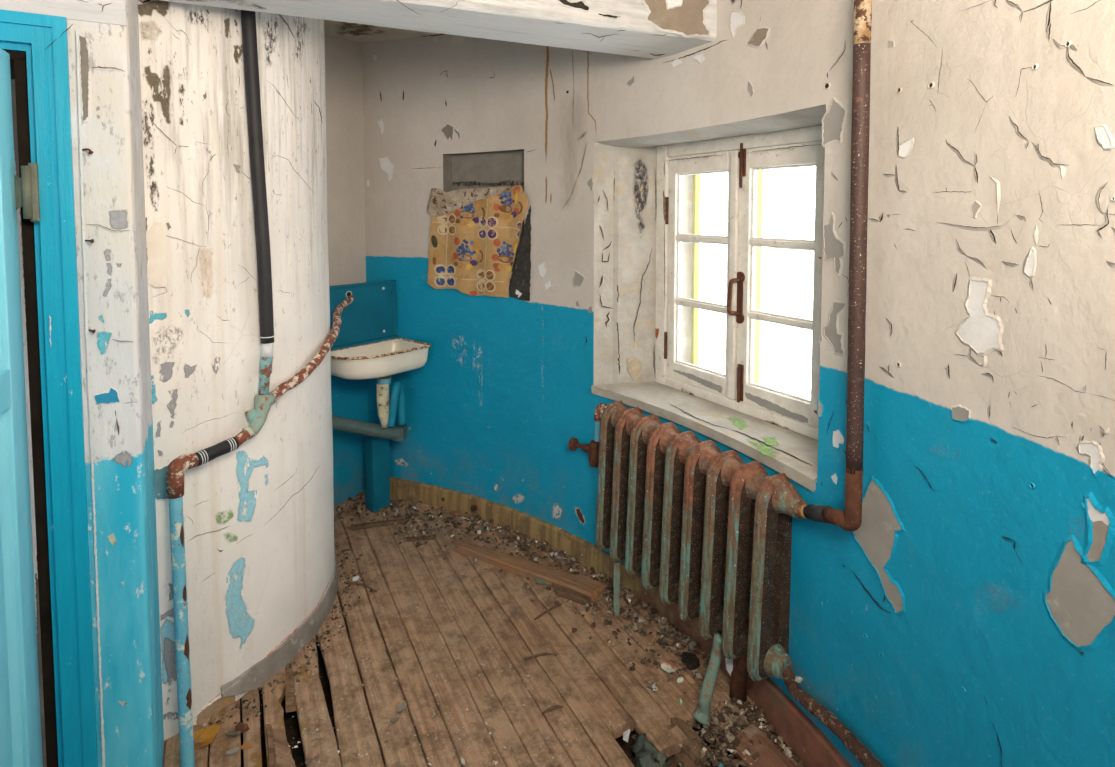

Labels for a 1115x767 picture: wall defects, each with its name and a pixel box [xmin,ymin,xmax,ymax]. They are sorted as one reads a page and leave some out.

damp [339,22,381,35]
crack [560,23,726,63]
peeling [642,0,711,38]
crack [961,0,1114,86]
corrosion [545,46,555,152]
crack [585,155,722,374]
crack [838,67,1115,479]
peeling [955,276,1004,356]
peeling [1078,440,1105,477]
peeling [851,475,907,617]
peeling [1042,491,1115,653]
crack [984,697,1014,767]